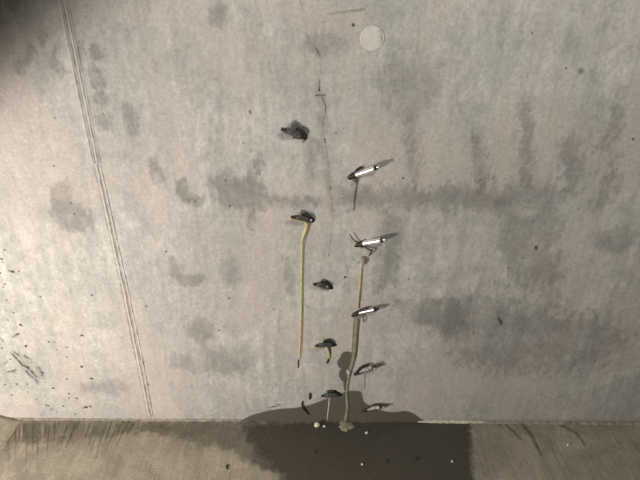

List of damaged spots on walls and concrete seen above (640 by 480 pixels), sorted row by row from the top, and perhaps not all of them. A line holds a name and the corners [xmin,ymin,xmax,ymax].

water stain [240,319,473,480]